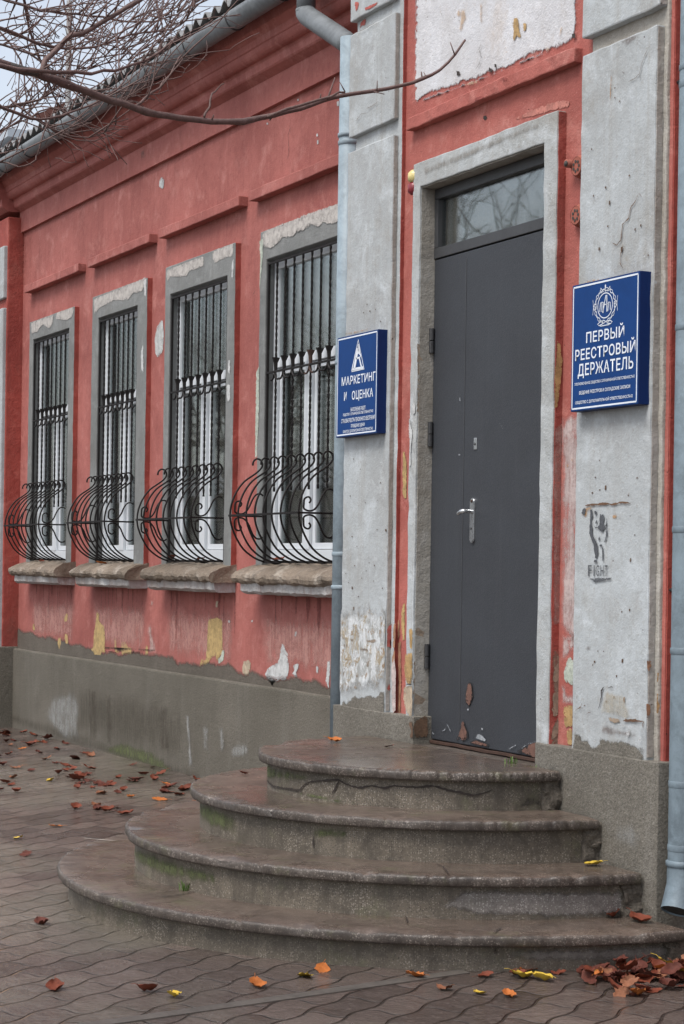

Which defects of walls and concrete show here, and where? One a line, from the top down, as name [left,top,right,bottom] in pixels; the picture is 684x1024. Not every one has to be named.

peeling [513,18,526,40]
peeling [31,307,74,334]
peeling [94,277,147,314]
peeling [166,244,234,281]
peeling [259,204,338,287]
crack [613,196,642,268]
peeling [402,344,423,498]
flaking render [17,565,428,738]
flaking render [551,652,643,760]
crack [266,777,491,797]